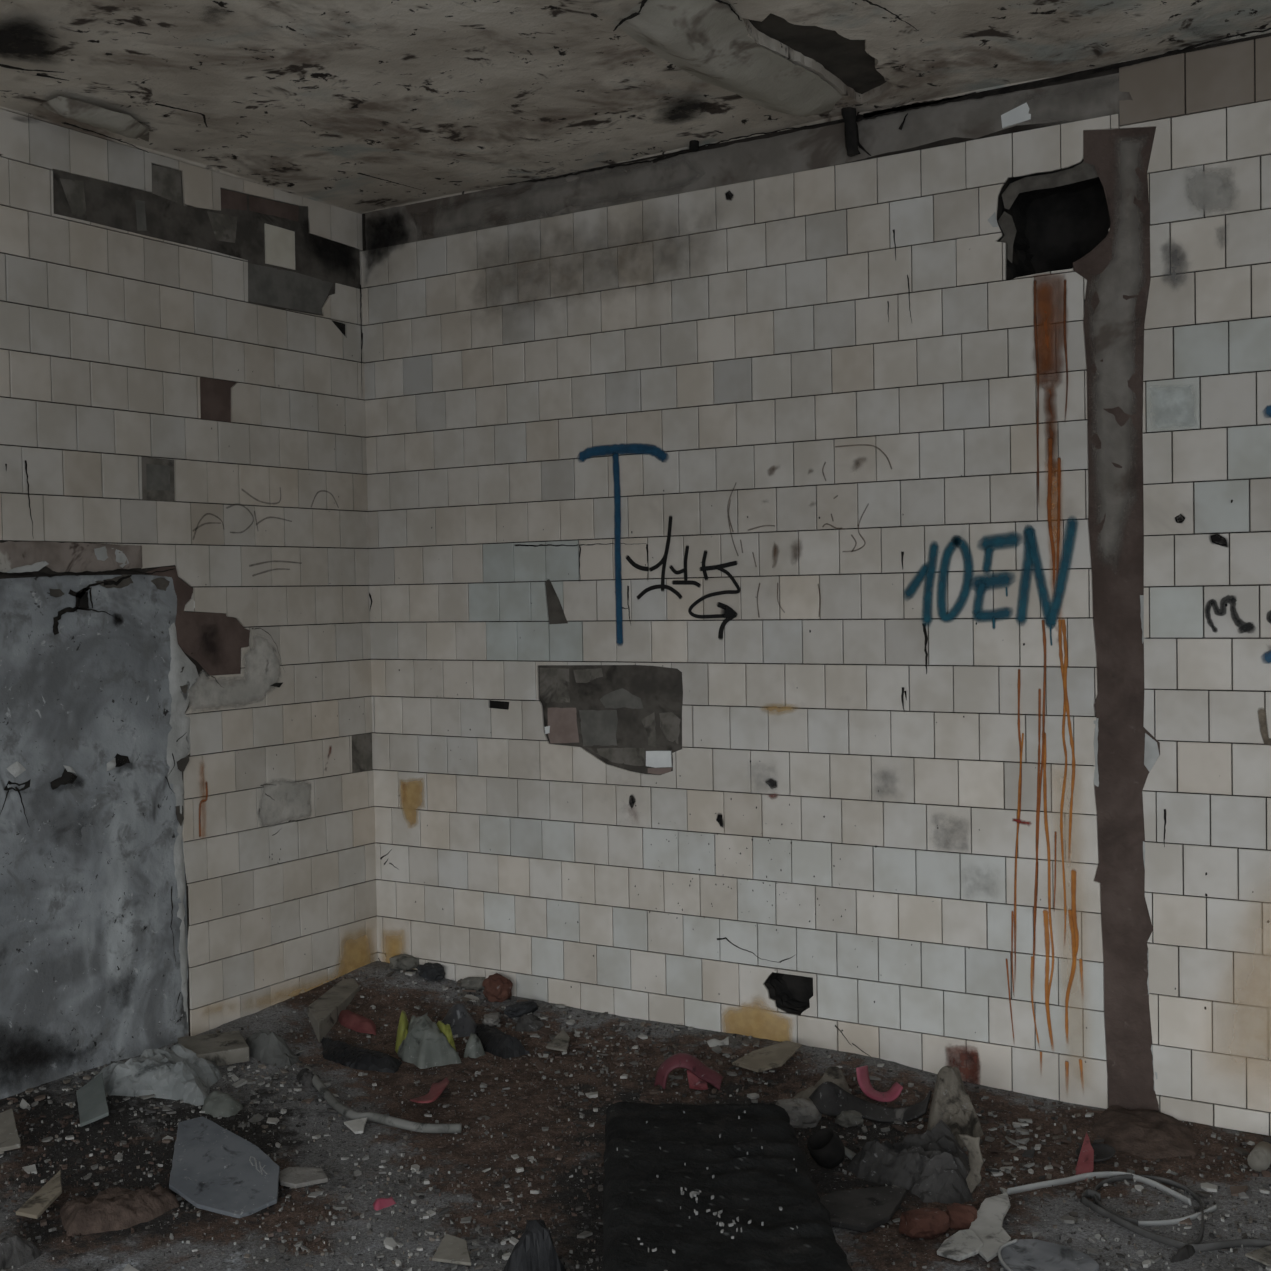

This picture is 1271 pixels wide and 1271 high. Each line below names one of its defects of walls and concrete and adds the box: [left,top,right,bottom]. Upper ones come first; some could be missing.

spalling [748,13,887,94]
peeling [40,73,1154,336]
peeling [199,370,253,429]
rust [1034,277,1068,583]
peeling [140,456,175,502]
peeling [0,541,250,693]
peeling [538,665,684,807]
spalling [0,761,31,826]
spalling [50,765,82,790]
water stain [401,781,422,825]
rust [1006,619,1083,1064]
spalling [766,970,813,1013]